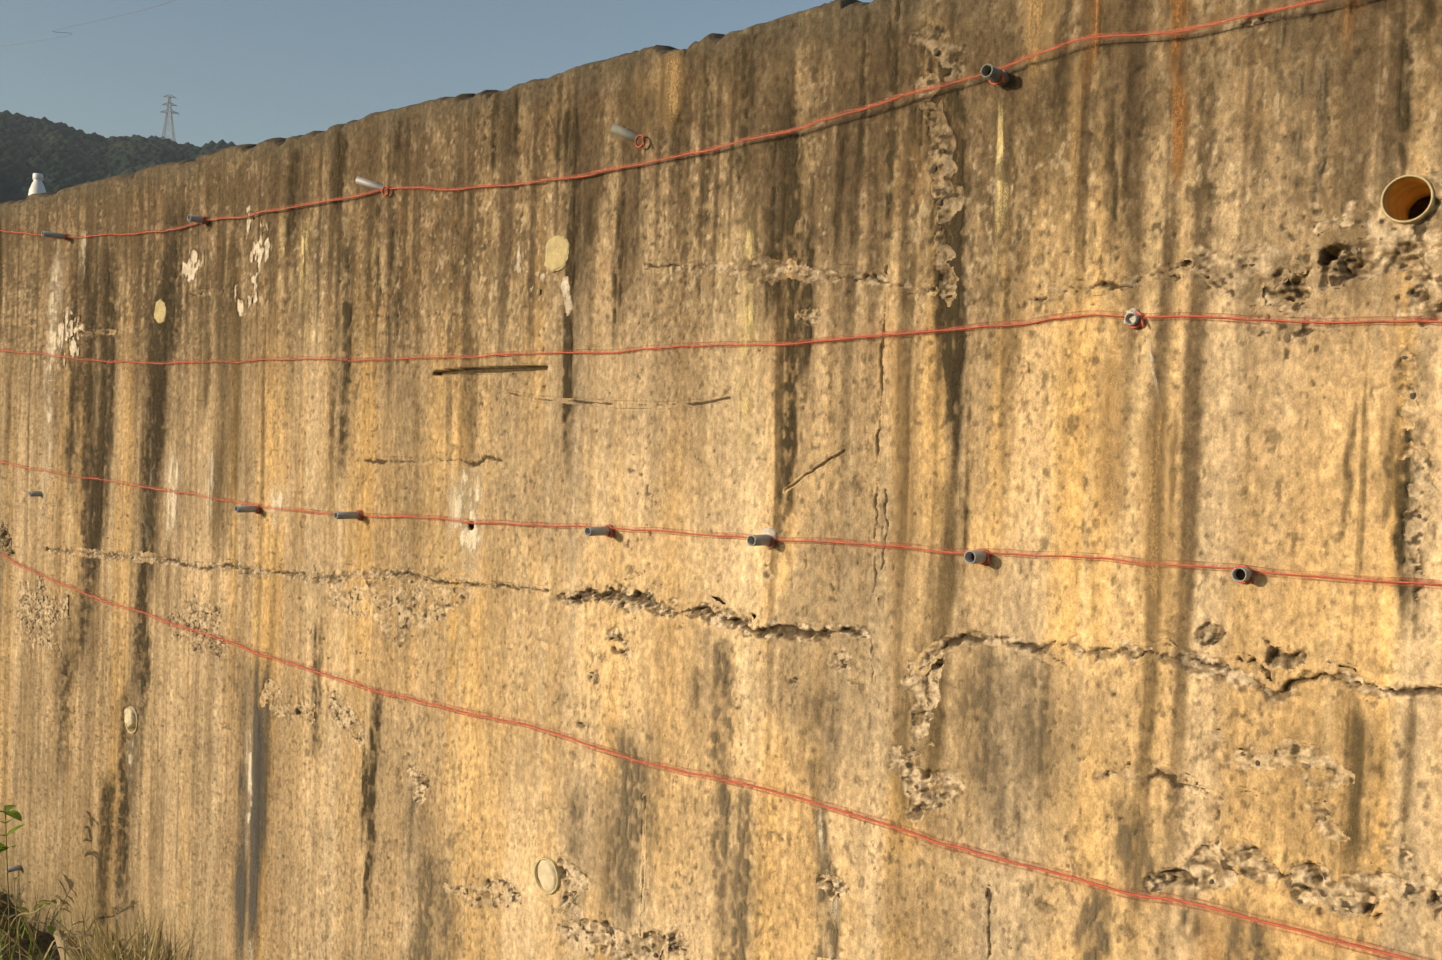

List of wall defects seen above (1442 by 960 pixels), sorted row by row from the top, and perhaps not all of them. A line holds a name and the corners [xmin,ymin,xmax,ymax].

spalling [907,20,969,307]
leakage [46,236,116,751]
leakage [95,215,181,933]
crack [44,255,940,695]
spalling [885,646,966,825]
crack [913,628,1442,711]
spalling [1208,728,1355,846]
spalling [1260,637,1335,673]
spalling [1170,171,1442,603]
spalling [442,874,523,911]
spalling [550,854,691,960]
spalling [1142,837,1442,928]